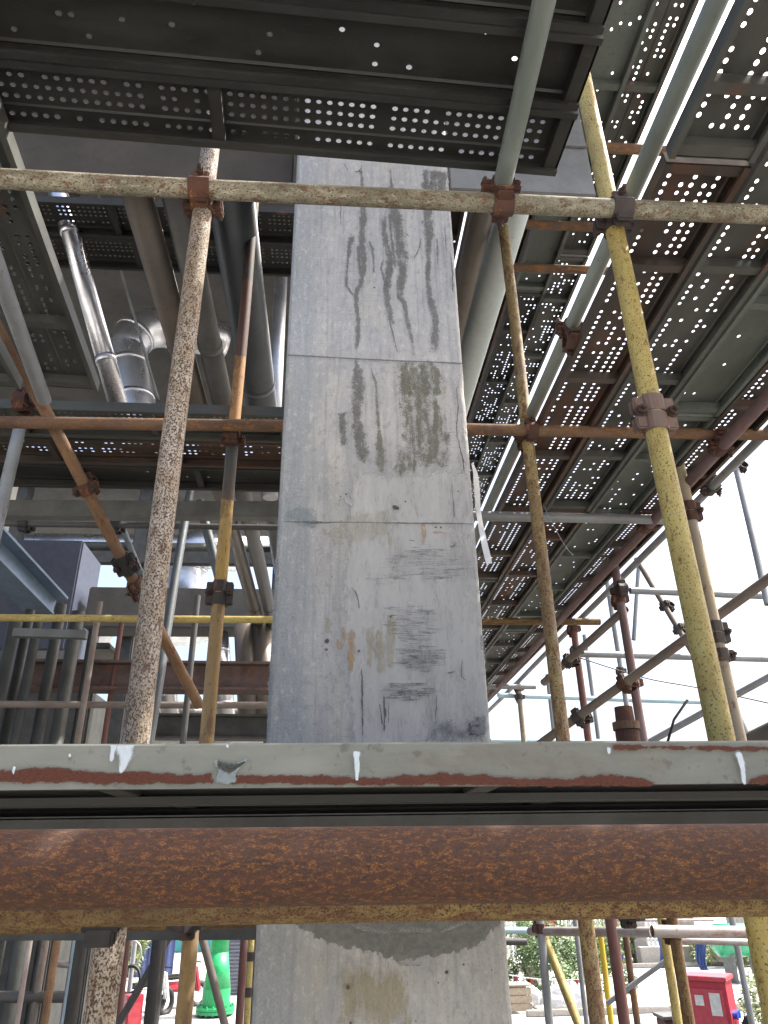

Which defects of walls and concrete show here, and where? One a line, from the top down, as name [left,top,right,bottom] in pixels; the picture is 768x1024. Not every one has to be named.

water stain [338,207,444,472]
corrosion [0,767,214,785]
corrosion [231,772,654,788]
corrosion [749,774,768,785]